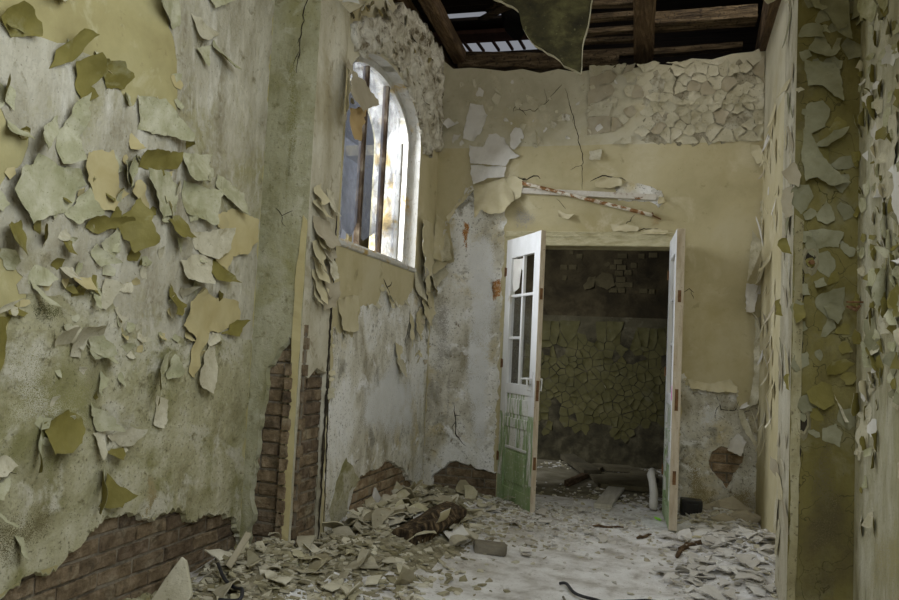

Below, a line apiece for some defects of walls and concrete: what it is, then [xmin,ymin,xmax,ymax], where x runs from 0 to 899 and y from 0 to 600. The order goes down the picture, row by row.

crack [293,0,308,73]
crack [513,87,626,183]
peeling [0,0,524,600]
peeling [583,0,899,556]
peeling [522,320,667,443]